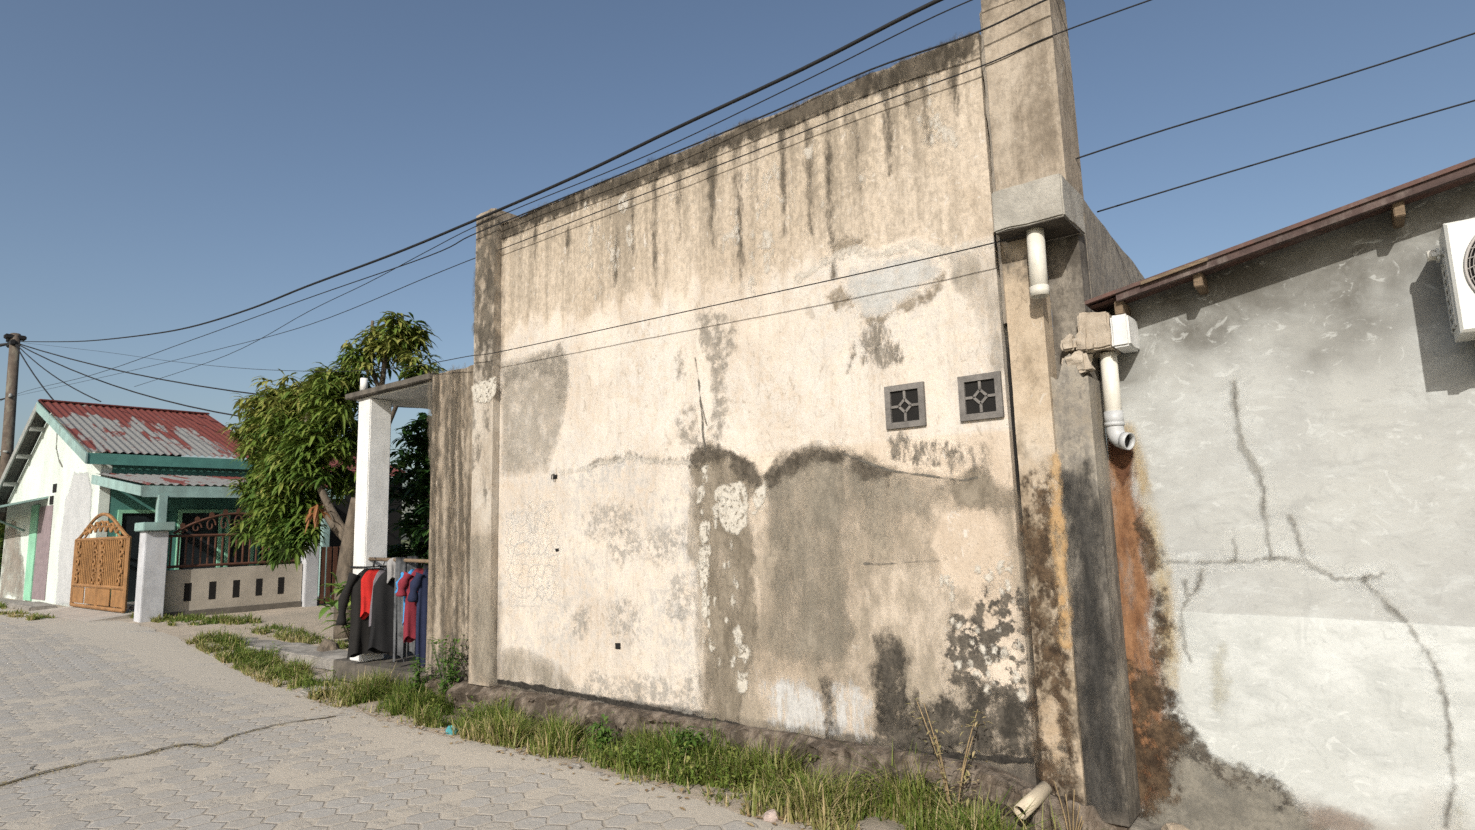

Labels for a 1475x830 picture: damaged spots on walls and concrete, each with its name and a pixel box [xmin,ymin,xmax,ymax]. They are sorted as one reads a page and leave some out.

crack [0,715,338,785]
water stain [428,33,975,688]
peeling [697,466,872,738]
flaking render [940,575,1065,763]
water stain [677,315,1364,830]
corrosion [1107,430,1176,806]
crack [1232,384,1303,551]